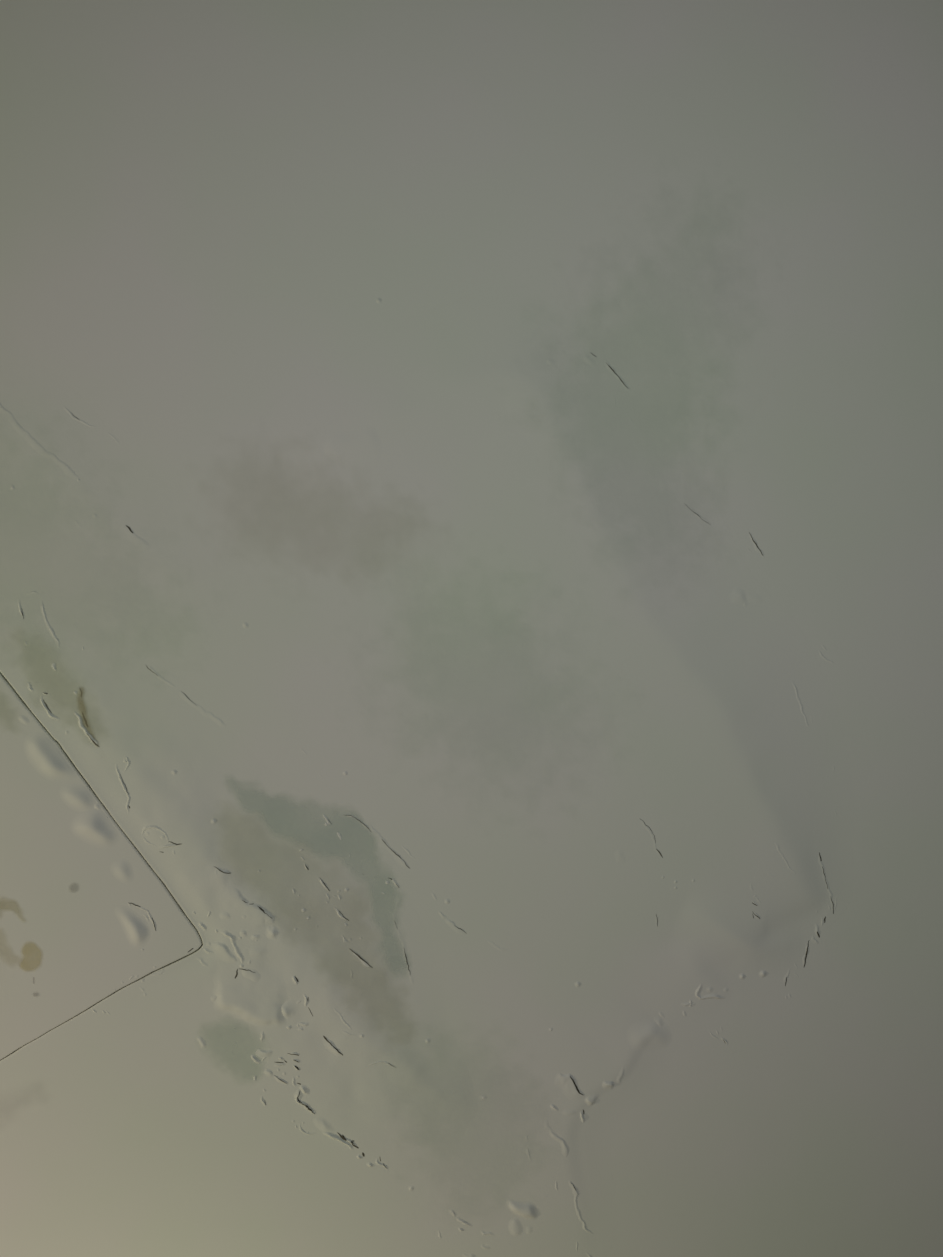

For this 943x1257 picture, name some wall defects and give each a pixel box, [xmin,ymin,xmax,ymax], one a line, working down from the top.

crack [747,532,764,559]
crack [783,852,837,1000]
crack [525,1065,625,1162]